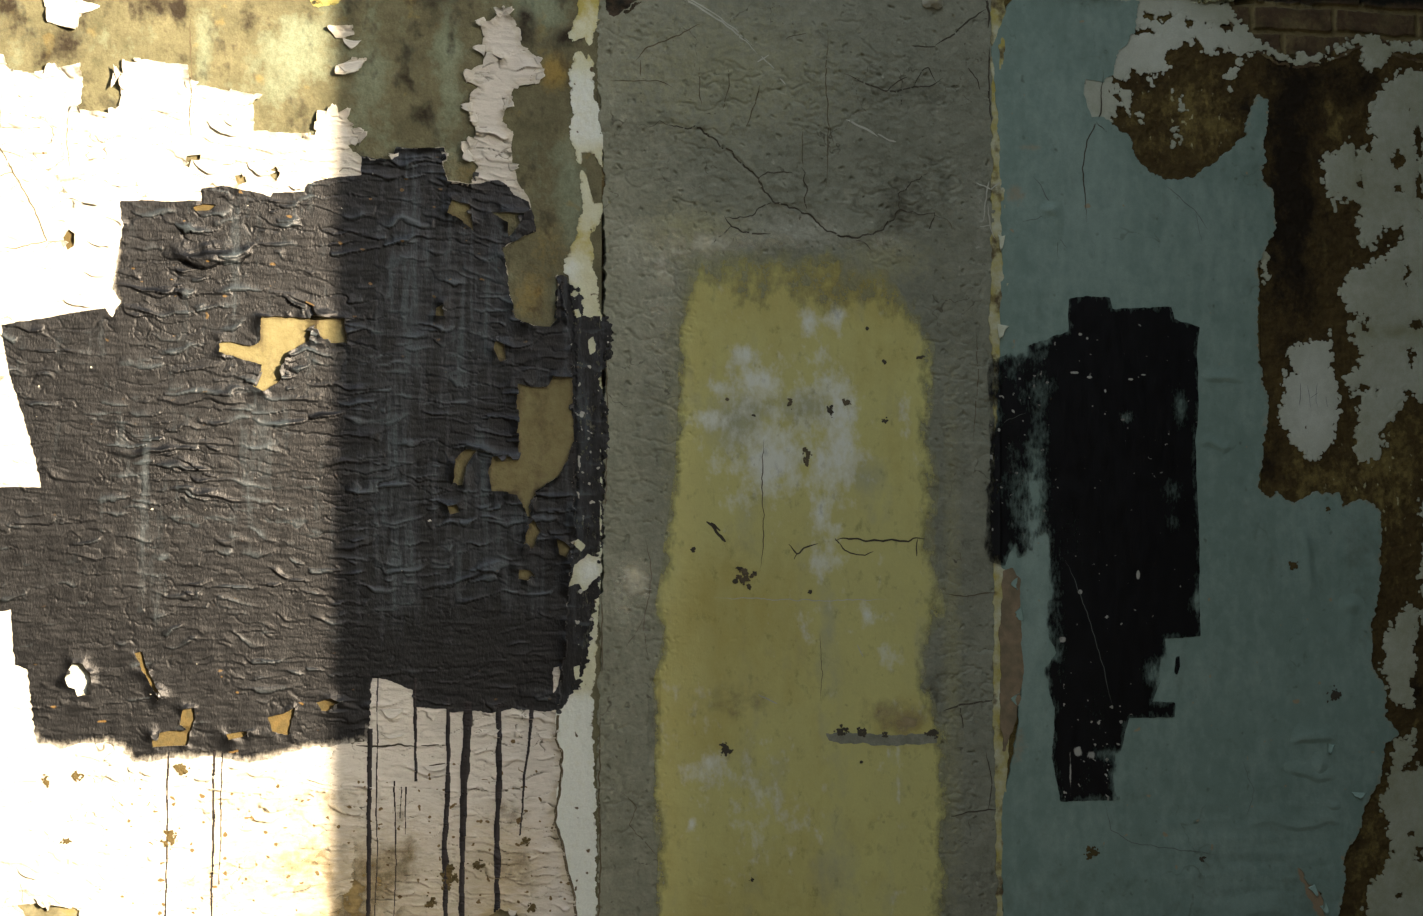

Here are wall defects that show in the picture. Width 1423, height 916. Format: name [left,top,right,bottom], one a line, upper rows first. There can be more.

crack [611,0,992,250]
peeling [0,0,641,327]
peeling [217,316,347,391]
spalling [1110,0,1423,916]
peeling [1083,846,1100,860]
peeling [18,903,84,916]
peeling [489,903,536,916]